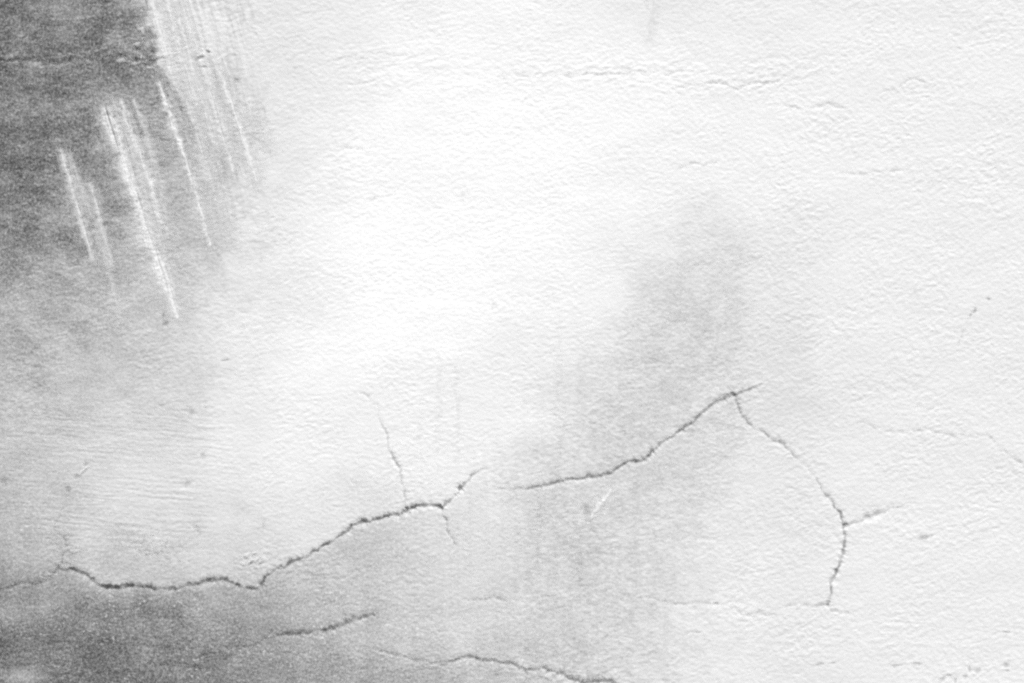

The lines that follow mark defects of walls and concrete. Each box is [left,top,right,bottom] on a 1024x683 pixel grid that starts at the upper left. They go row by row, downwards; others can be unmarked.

leakage [0,0,260,320]
crack [351,504,442,526]
crack [102,582,155,590]